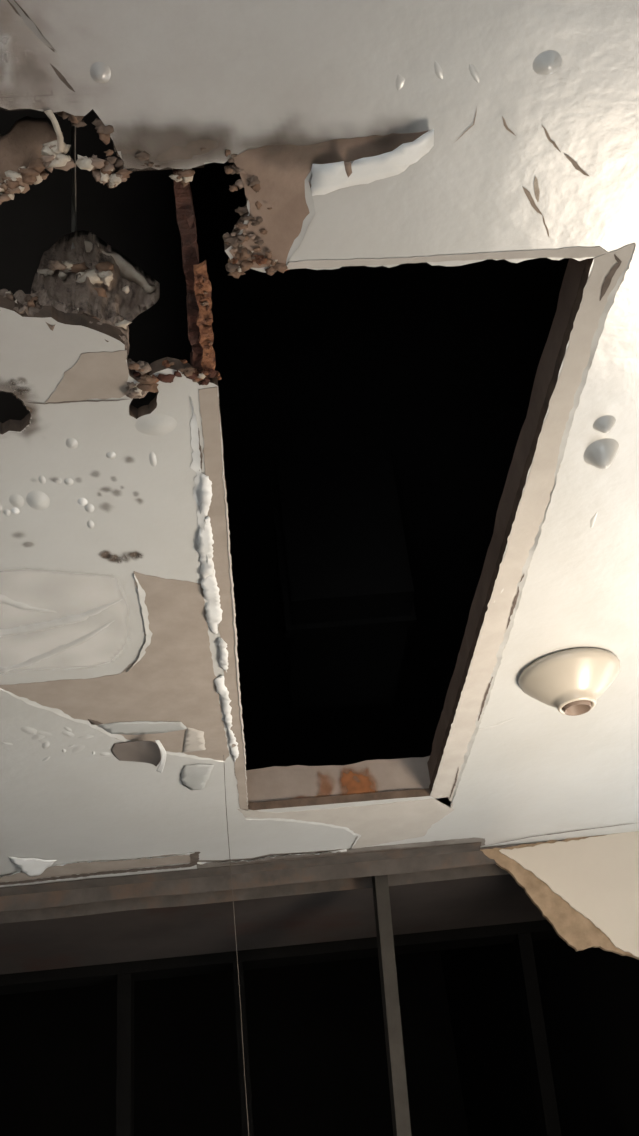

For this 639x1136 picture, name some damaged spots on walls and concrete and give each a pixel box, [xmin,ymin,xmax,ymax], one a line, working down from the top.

spalling [57,111,154,188]
crack [455,107,516,142]
crack [542,126,589,176]
rust [169,168,195,187]
crack [523,177,549,237]
rust [162,359,222,380]
peeling [0,129,636,885]
rust [318,769,376,797]